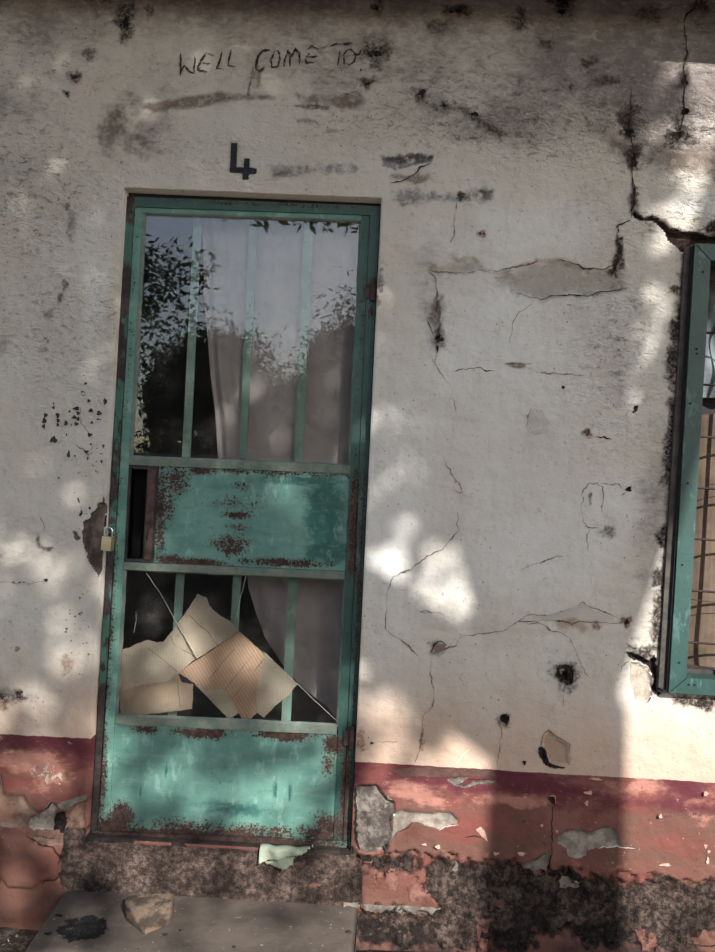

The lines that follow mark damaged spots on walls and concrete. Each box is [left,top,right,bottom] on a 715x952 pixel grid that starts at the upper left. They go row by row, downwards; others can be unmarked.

crack [677,0,708,135]
crack [609,90,643,278]
water stain [663,116,714,169]
crack [427,271,577,376]
water stain [662,258,683,489]
spalling [72,496,108,577]
water stain [650,512,668,645]
crack [385,602,618,708]
spalling [621,644,661,703]
water stain [673,695,715,711]
peeling [29,762,62,785]
spalling [0,776,715,952]